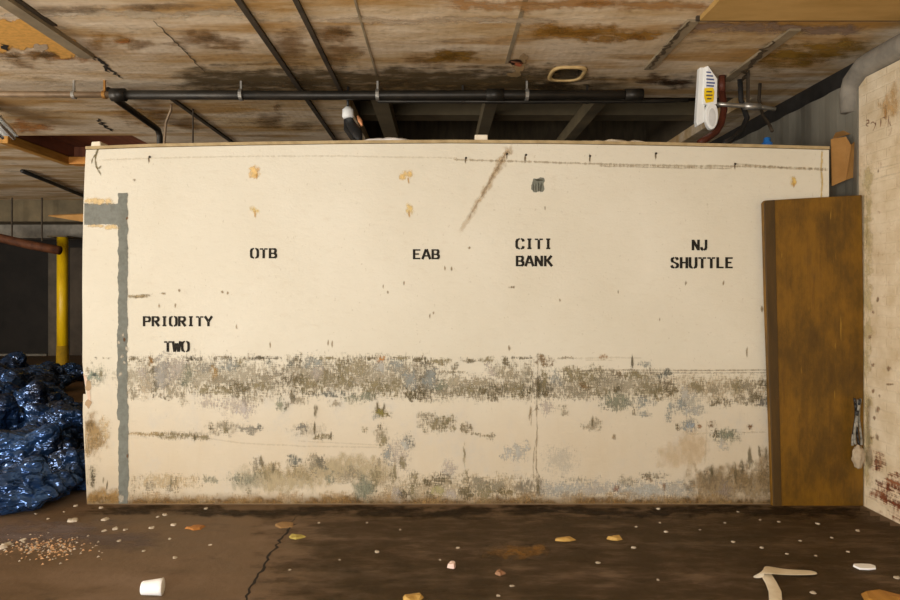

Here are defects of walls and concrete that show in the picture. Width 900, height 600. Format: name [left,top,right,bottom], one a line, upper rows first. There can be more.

damp [1,51,72,67]
peeling [0,13,76,59]
damp [37,4,256,19]
damp [180,0,709,91]
peeling [83,193,767,504]
crack [245,516,297,600]